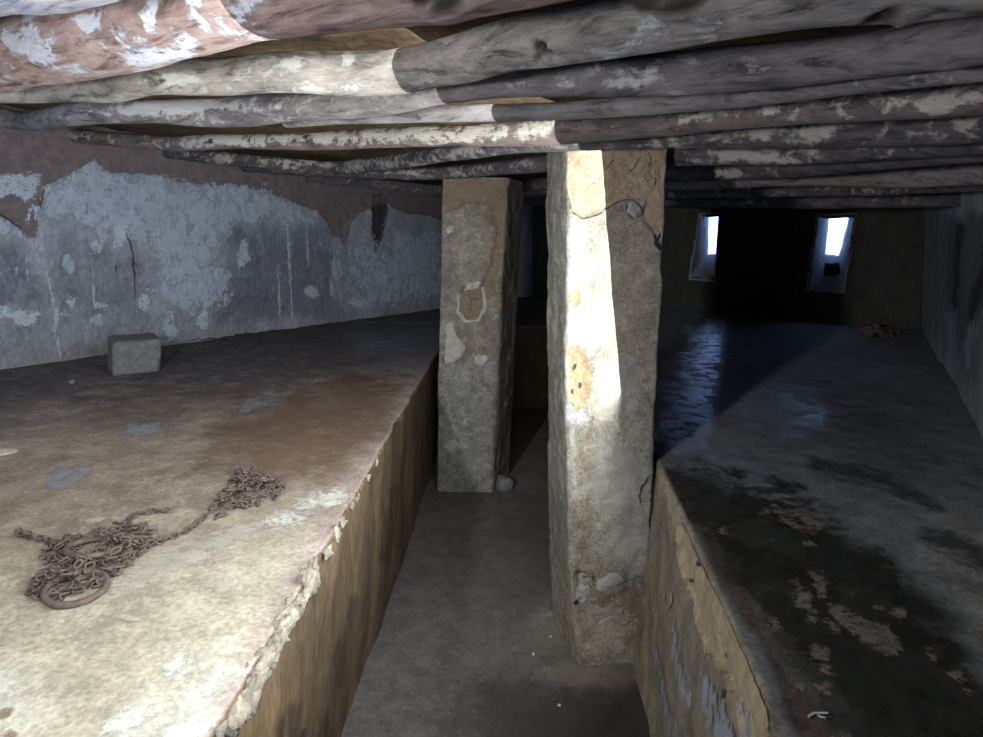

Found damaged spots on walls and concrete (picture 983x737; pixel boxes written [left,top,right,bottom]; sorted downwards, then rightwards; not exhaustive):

peeling [0,125,506,364]
spalling [567,149,663,246]
peeling [473,354,488,366]
spalling [566,344,592,412]
damp [567,218,643,423]
damp [569,419,652,567]
spalling [758,504,825,548]
spalling [163,487,360,737]
damp [651,621,750,737]
spalling [675,524,770,737]
damp [667,466,983,737]